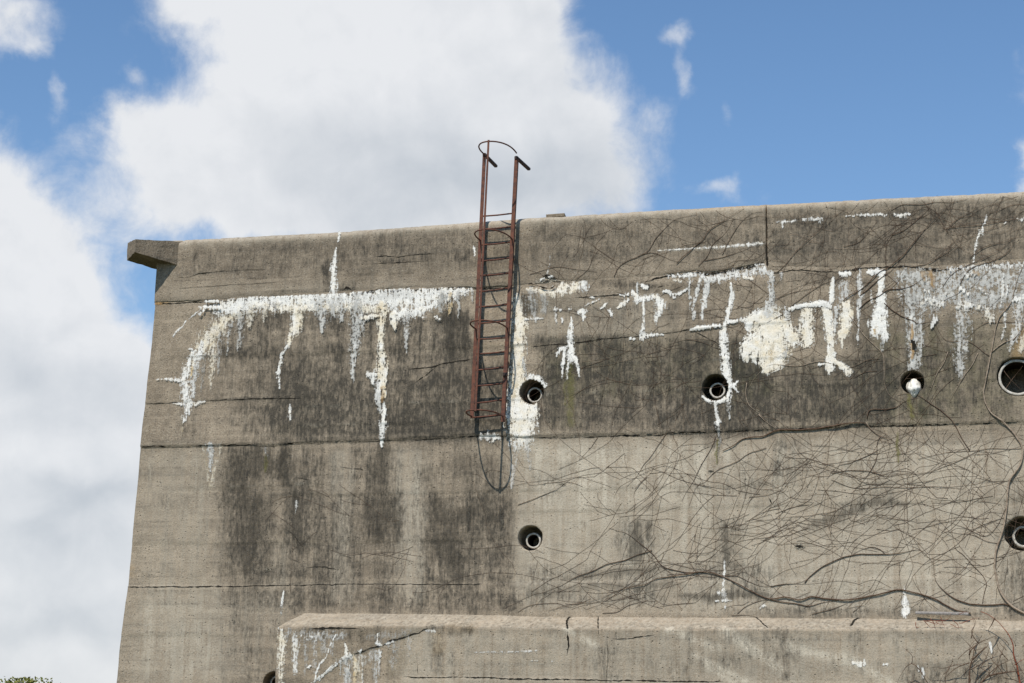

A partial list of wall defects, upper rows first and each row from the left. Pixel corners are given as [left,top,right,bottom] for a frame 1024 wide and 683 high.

leakage [156,231,474,448]
leakage [480,215,1024,489]
leakage [202,441,222,487]
leakage [276,627,411,683]
crack [406,616,721,682]